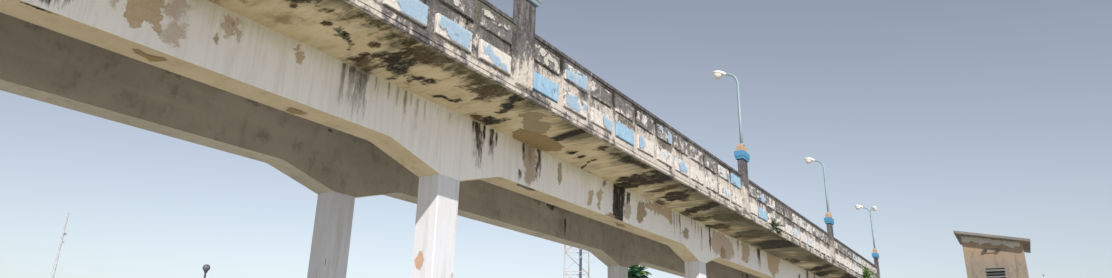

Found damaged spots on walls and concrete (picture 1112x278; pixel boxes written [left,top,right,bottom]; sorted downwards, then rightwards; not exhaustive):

peeling [124,0,190,46]
peeling [213,16,241,44]
peeling [133,49,181,77]
water stain [286,0,537,161]
peeling [512,112,564,185]
peeling [588,181,689,240]
water stain [551,129,857,278]
peeling [414,251,424,270]
peeling [711,231,750,263]